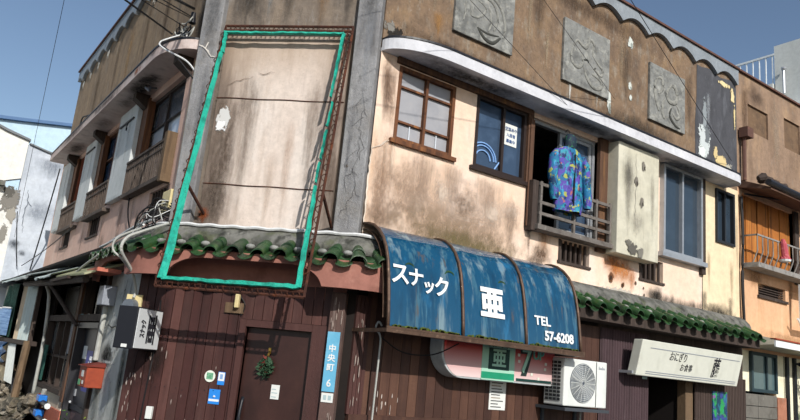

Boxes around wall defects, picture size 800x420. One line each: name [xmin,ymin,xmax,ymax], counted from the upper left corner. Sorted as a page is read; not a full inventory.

peeling [216,106,231,131]
flaking render [695,65,737,171]
leakage [212,123,233,179]
crack [338,86,389,232]
spalling [0,185,21,243]